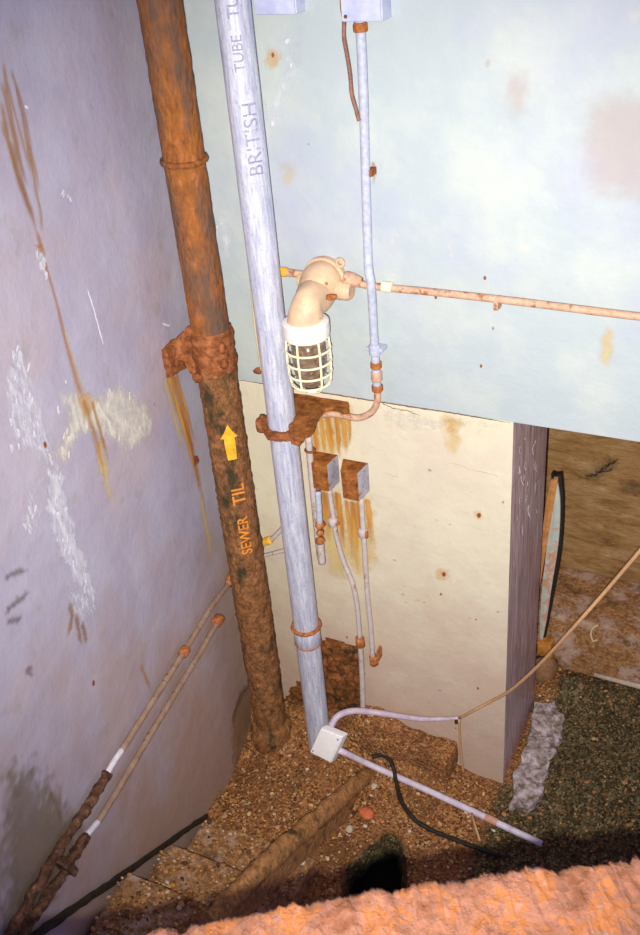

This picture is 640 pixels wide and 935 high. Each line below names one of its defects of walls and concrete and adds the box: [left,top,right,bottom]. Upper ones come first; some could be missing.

corrosion [3,73,41,212]
corrosion [45,263,106,475]
corrosion [165,375,199,478]
corrosion [313,417,351,452]
corrosion [322,492,372,570]